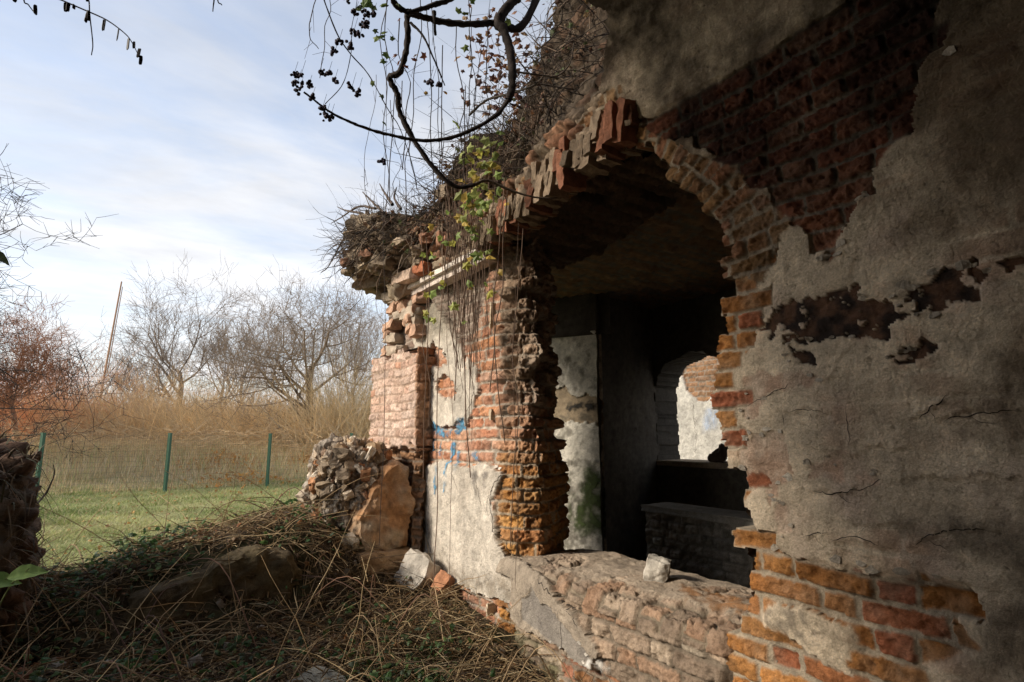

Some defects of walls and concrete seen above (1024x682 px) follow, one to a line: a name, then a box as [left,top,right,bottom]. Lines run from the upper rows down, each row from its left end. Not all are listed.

spalling [427,0,957,557]
crack [918,395,1011,424]
spalling [726,254,1024,682]
crack [819,479,880,503]
spalling [489,597,516,635]